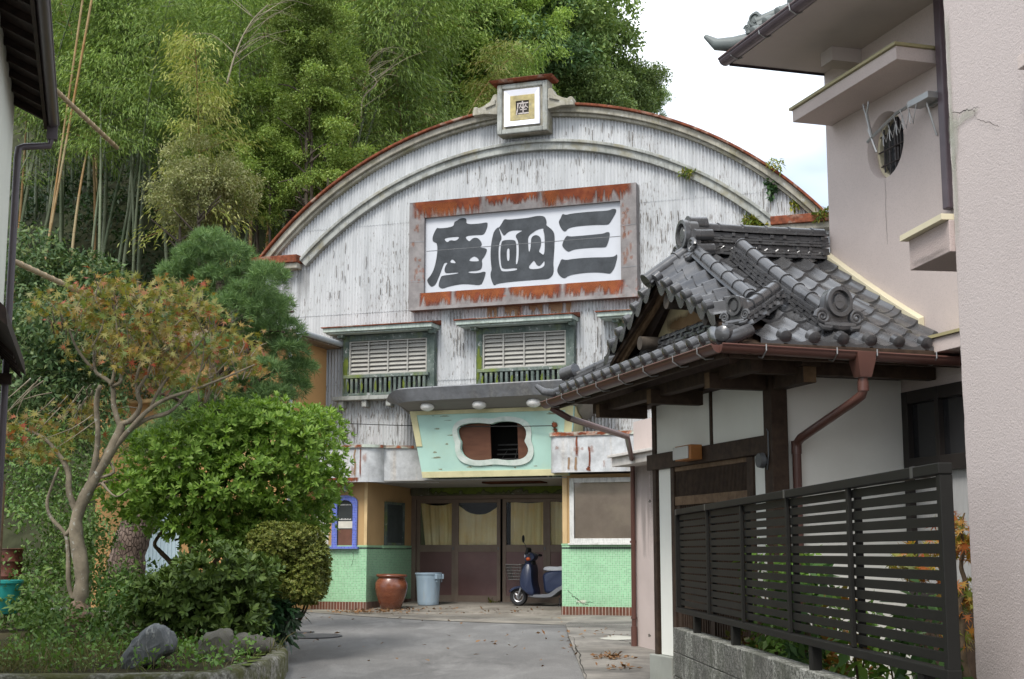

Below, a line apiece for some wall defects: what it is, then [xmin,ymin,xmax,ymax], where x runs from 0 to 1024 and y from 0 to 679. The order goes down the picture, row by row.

corrosion [414,183,630,218]
corrosion [420,280,623,317]
corrosion [552,422,605,471]